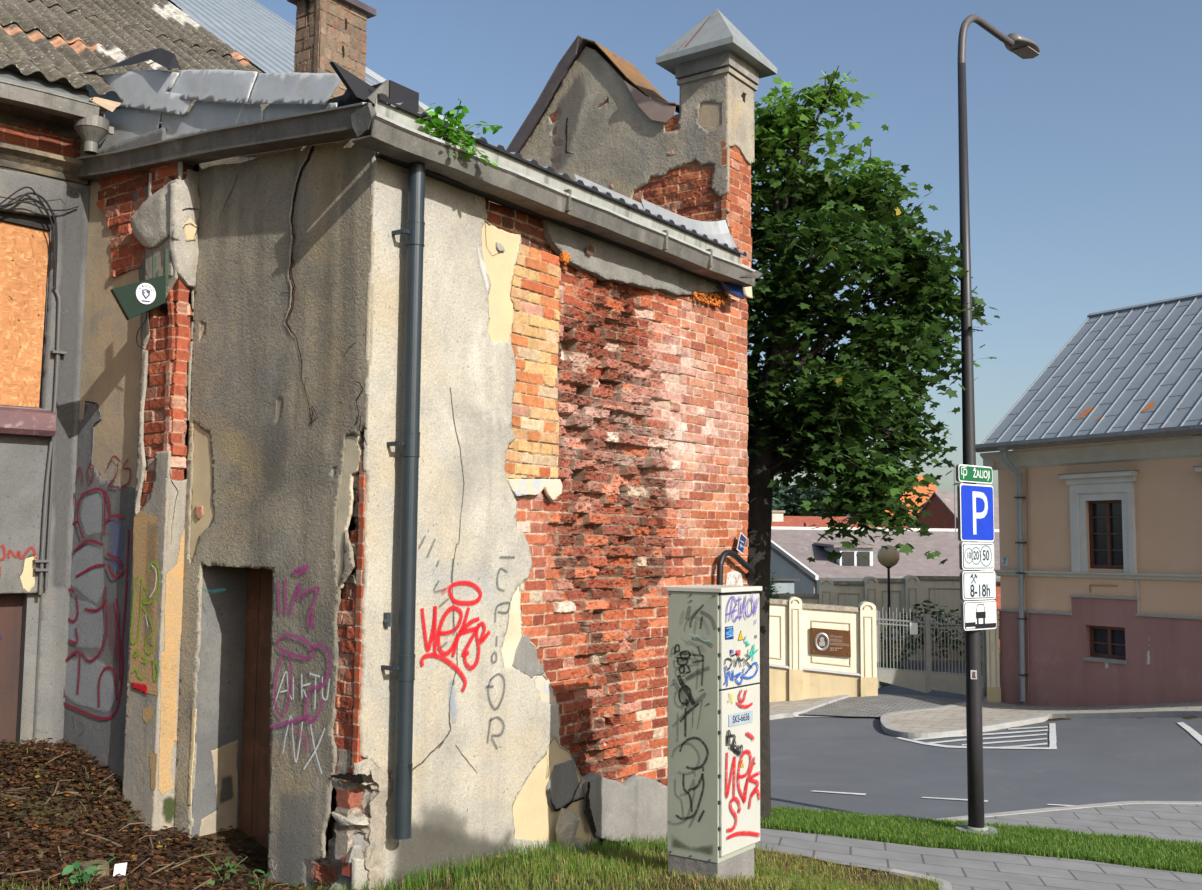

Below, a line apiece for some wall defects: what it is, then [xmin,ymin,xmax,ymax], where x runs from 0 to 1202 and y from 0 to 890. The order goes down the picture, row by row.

flaking render [0,122,81,159]
flaking render [79,170,151,488]
peeling [129,422,214,805]
crack [281,146,318,425]
spalling [308,435,394,890]
crack [344,342,367,444]
crack [413,387,476,771]
spalling [481,200,753,844]
spalling [632,151,722,222]